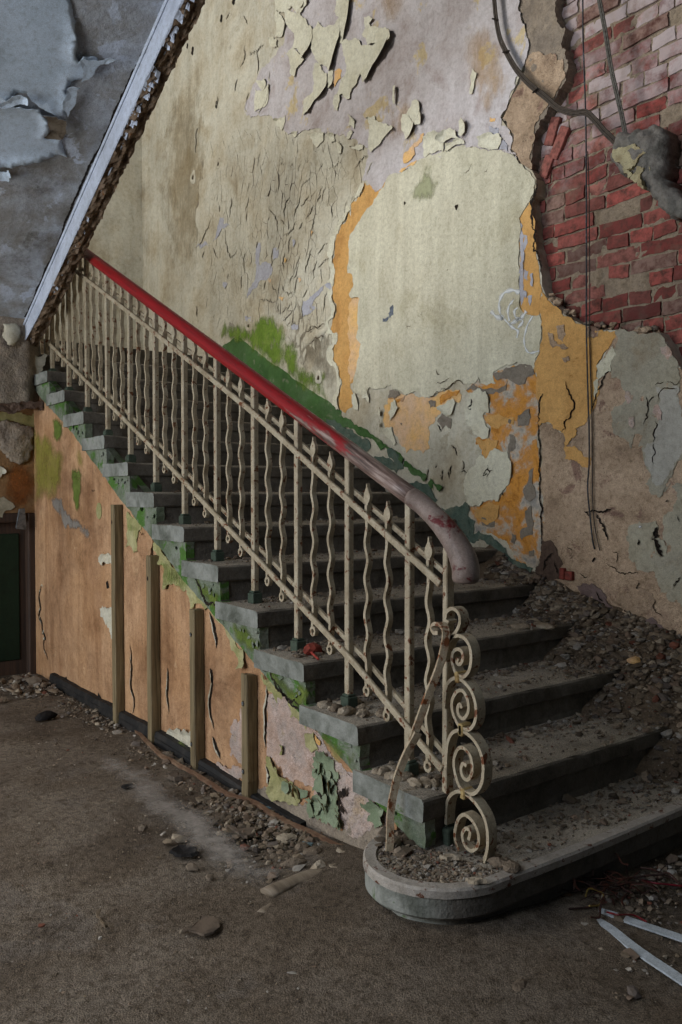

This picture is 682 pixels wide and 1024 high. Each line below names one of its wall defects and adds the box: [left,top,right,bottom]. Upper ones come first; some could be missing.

peeling [0,0,117,169]
crack [216,12,270,113]
spalling [26,0,205,347]
crack [195,155,372,329]
peeling [244,0,682,637]
flaking render [0,419,35,477]
crack [537,371,680,616]
crack [38,584,47,655]
crack [195,579,224,623]
crack [263,670,299,710]
flaking render [257,674,396,850]